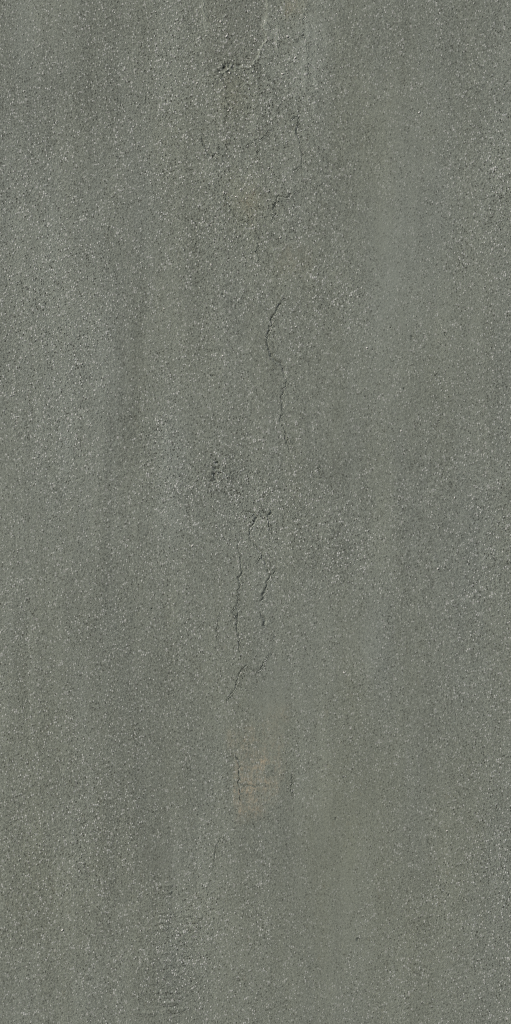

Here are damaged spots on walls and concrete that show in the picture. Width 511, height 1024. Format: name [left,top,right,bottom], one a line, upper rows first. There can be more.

crack [200,74,310,265]
crack [264,298,292,450]
crack [214,507,278,704]